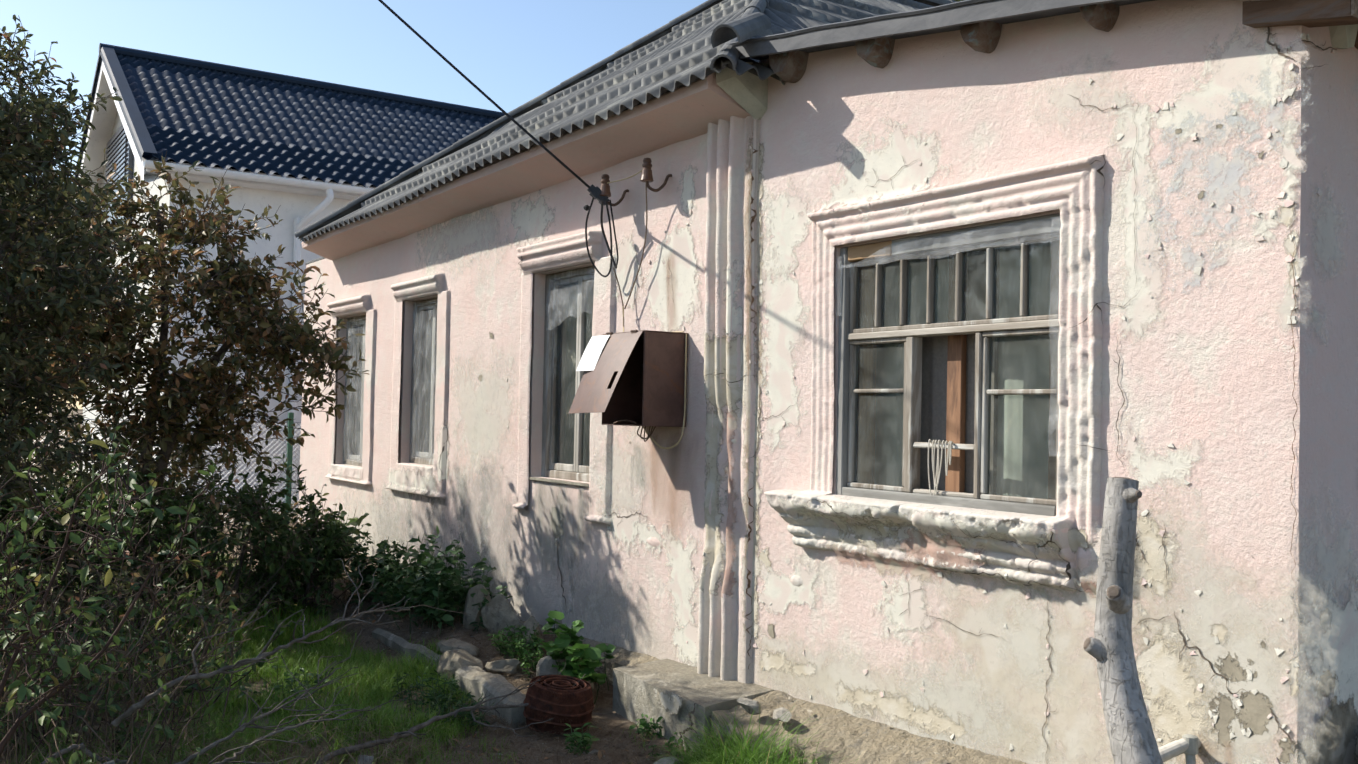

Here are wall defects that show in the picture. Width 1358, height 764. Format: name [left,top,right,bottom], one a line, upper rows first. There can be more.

crack [1264,27,1337,69]
peeling [599,119,1113,764]
crack [1067,94,1139,475]
flaking render [1110,32,1358,764]
crack [898,520,1087,759]
leakage [1293,696,1358,764]